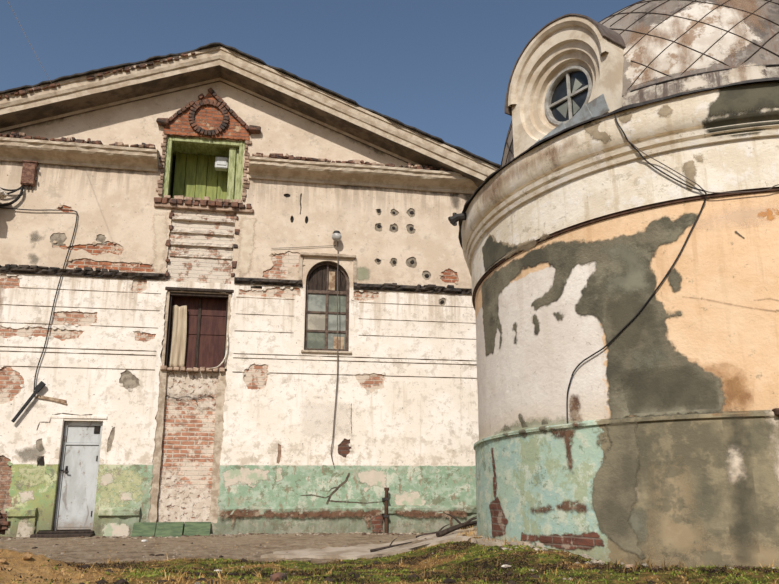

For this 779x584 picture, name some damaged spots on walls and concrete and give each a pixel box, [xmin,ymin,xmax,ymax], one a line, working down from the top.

flaking render [0,233,155,293]
peeling [489,234,549,265]
flaking render [0,310,97,341]
flaking render [0,365,24,404]
flaking render [242,364,269,389]
flaking render [353,372,386,394]
flaking render [338,438,352,458]
flaking render [0,439,45,537]
flaking render [489,448,508,538]
flaking render [521,532,604,551]